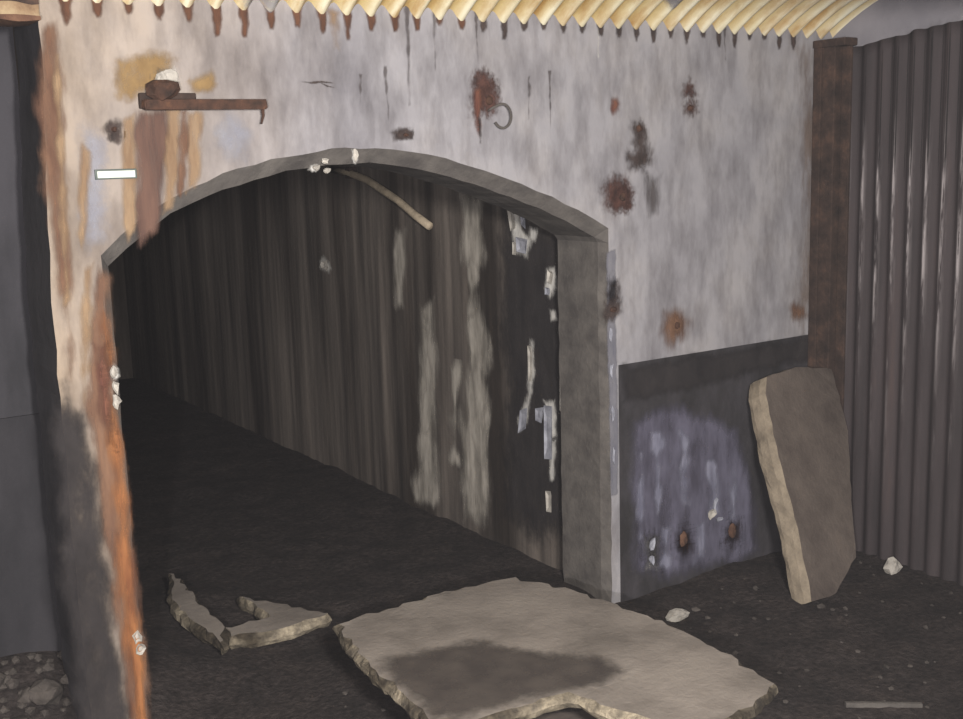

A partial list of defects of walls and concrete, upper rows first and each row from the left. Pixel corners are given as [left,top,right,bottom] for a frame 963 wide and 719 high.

corrosion [59,0,72,24]
corrosion [92,0,102,17]
corrosion [117,55,170,99]
corrosion [472,71,499,137]
corrosion [36,26,90,304]
corrosion [107,110,203,245]
corrosion [604,122,656,211]
peeling [507,211,537,255]
peeling [545,268,556,297]
corrosion [663,312,684,343]
peeling [518,341,561,512]
corrosion [82,270,147,719]